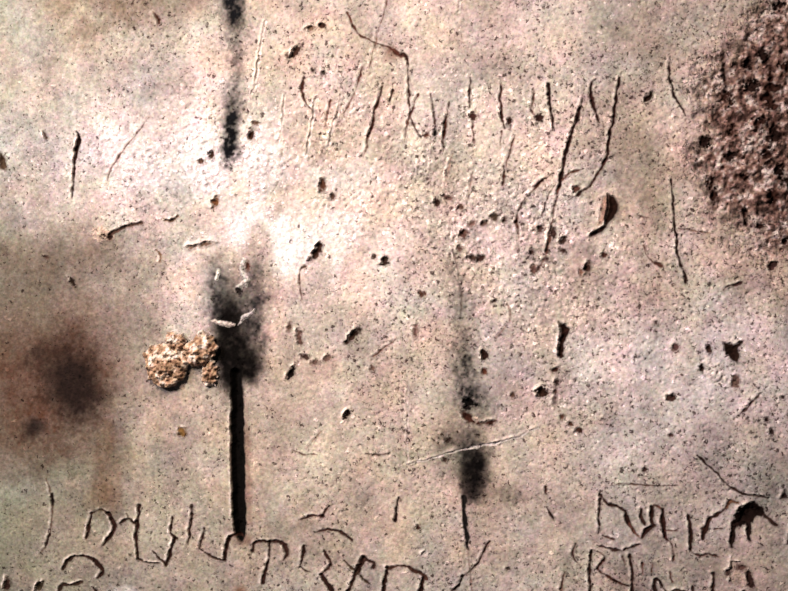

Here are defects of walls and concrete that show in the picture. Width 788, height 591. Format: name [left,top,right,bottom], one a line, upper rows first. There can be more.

spalling [677,0,788,273]
leakage [0,502,61,591]
leakage [0,222,152,525]
crack [228,367,248,543]